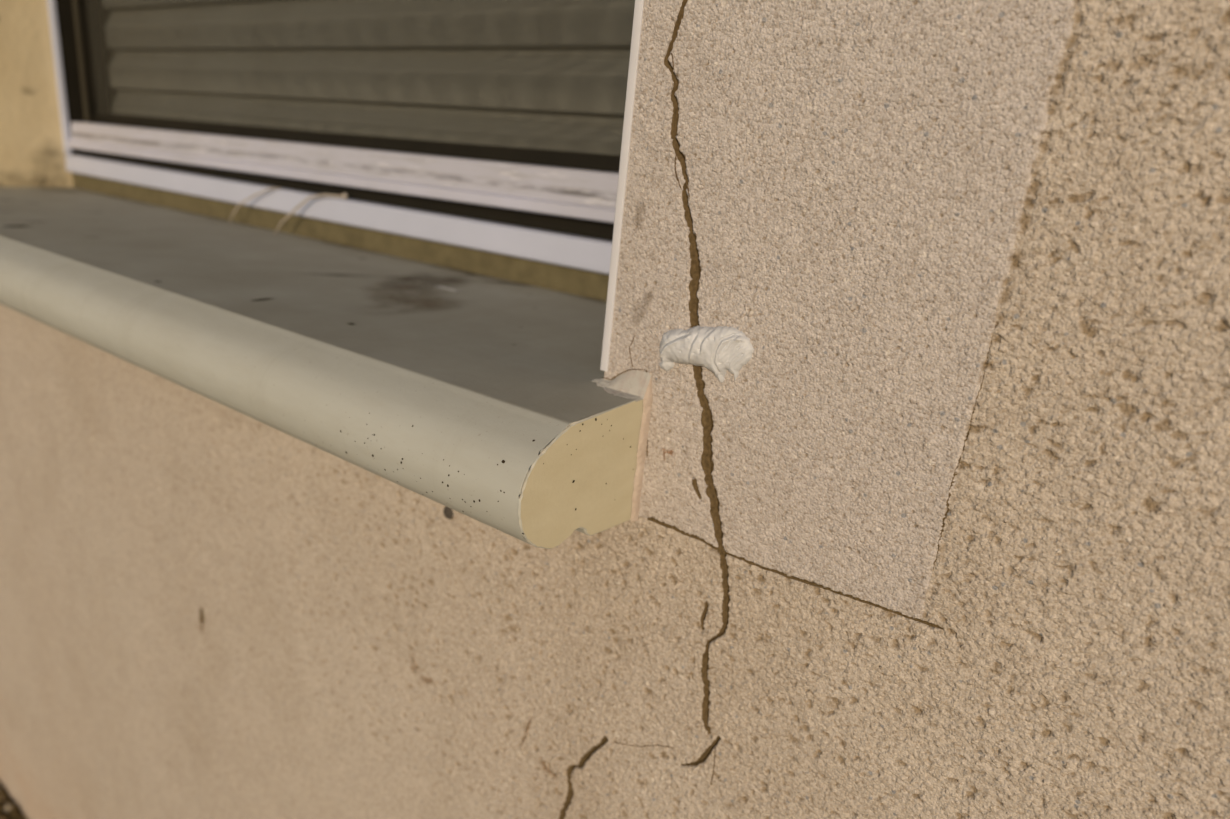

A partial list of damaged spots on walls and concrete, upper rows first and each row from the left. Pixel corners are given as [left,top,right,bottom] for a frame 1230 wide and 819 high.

crack [664,0,701,328]
crack [559,365,943,819]